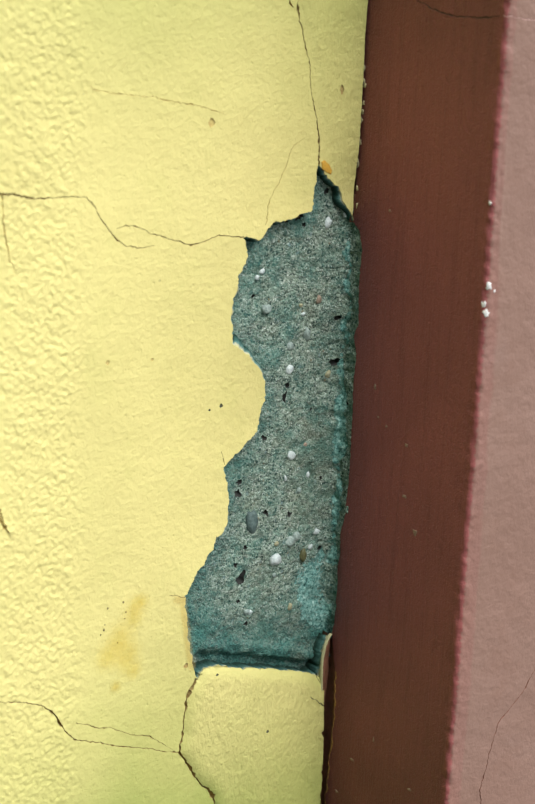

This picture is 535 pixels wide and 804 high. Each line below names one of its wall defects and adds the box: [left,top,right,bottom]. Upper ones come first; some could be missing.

crack [92,88,225,115]
crack [265,0,320,225]
crack [0,191,243,270]
spalling [184,160,362,804]
crack [0,679,215,804]
crack [479,673,533,804]